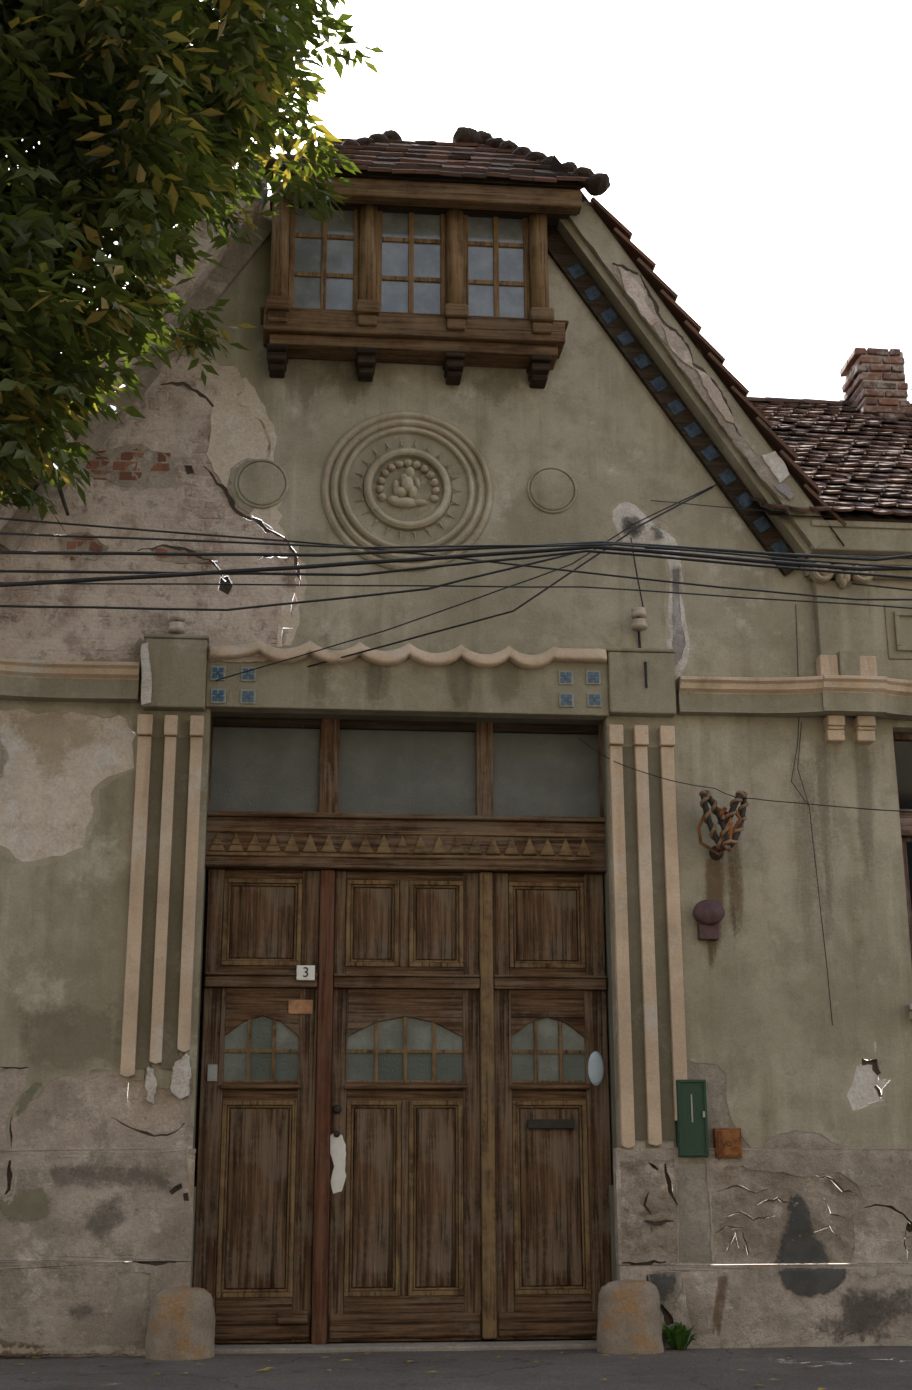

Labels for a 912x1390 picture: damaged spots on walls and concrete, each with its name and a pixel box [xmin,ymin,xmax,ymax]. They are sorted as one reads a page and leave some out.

flaking render [0,356,307,705]
flaking render [0,704,138,868]
flaking render [9,1052,195,1213]
flaking render [841,1042,895,1114]
leakage [722,1196,912,1348]
crack [864,1204,912,1248]
leakage [0,1344,136,1355]